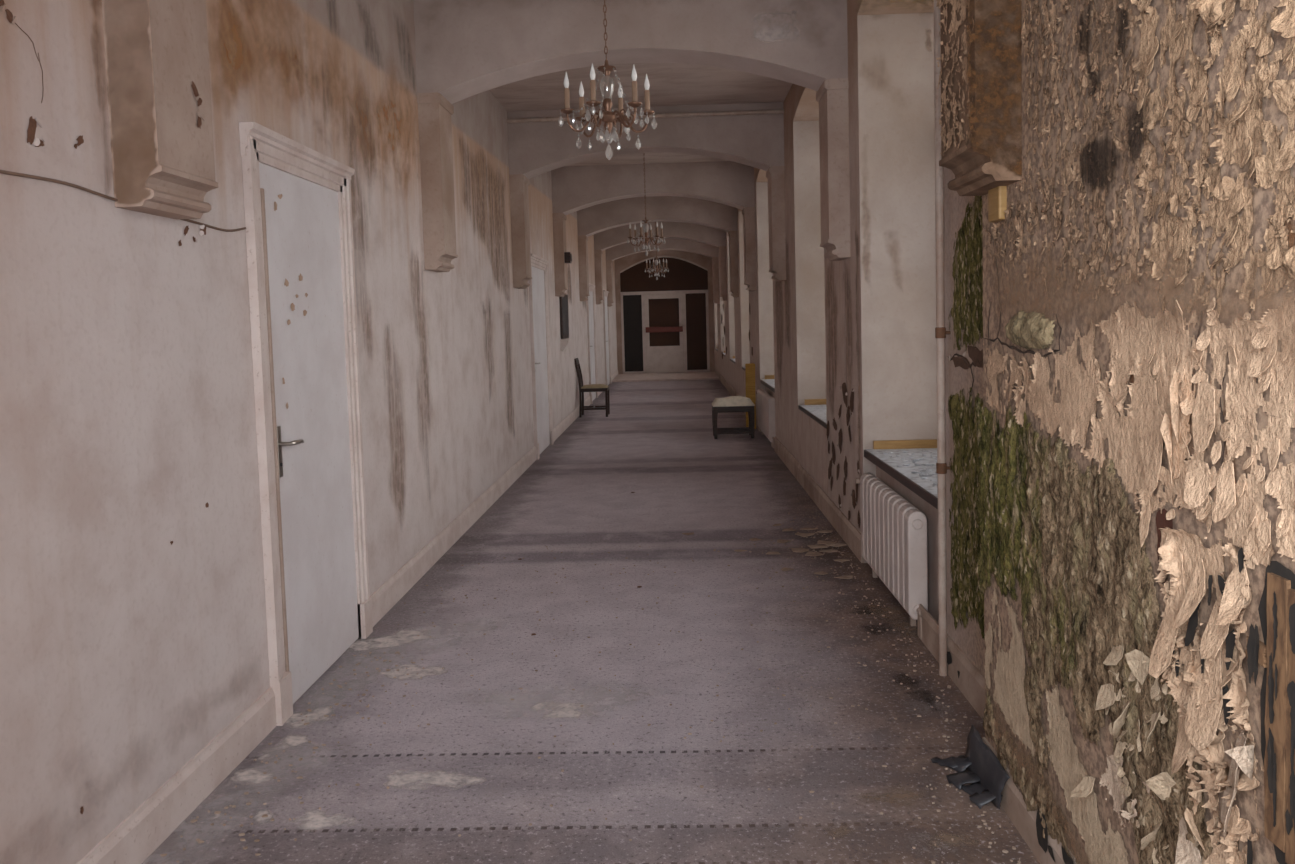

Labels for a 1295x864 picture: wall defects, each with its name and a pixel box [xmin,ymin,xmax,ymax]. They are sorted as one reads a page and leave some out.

peeling [0,0,16,24]
peeling [936,0,974,156]
damp [1078,6,1097,94]
damp [1119,11,1127,54]
peeling [27,116,45,147]
damp [1080,106,1148,189]
peeling [826,382,860,528]
peeling [949,0,1295,864]